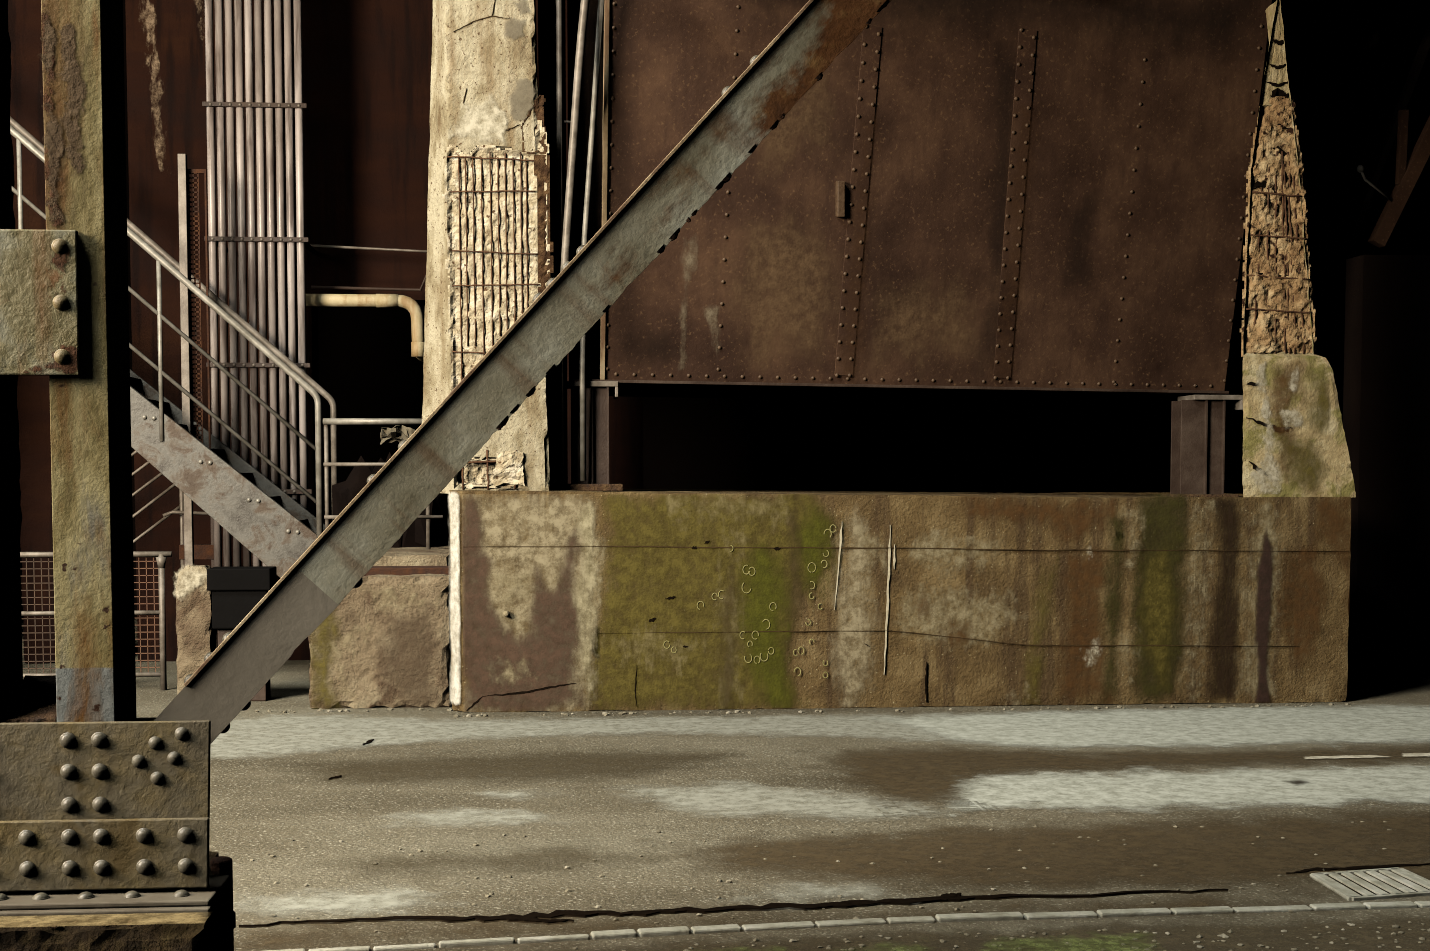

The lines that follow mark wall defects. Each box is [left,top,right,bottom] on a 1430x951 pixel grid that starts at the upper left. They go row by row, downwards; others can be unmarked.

corrosion [41,3,64,227]
crack [454,0,510,32]
spalling [442,78,553,391]
peeling [505,0,529,39]
corrosion [748,105,811,153]
spalling [1240,88,1317,357]
leakage [1188,362,1302,703]
crack [239,889,1228,928]